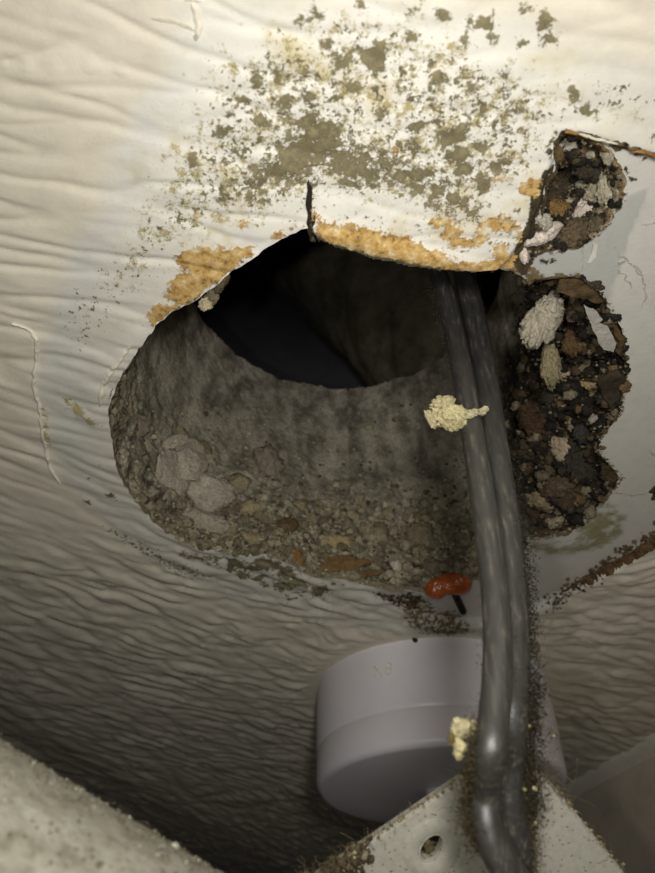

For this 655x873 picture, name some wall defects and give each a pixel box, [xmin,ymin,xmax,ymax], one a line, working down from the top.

peeling [141,244,255,326]
water stain [65,0,655,351]
spalling [270,129,637,541]